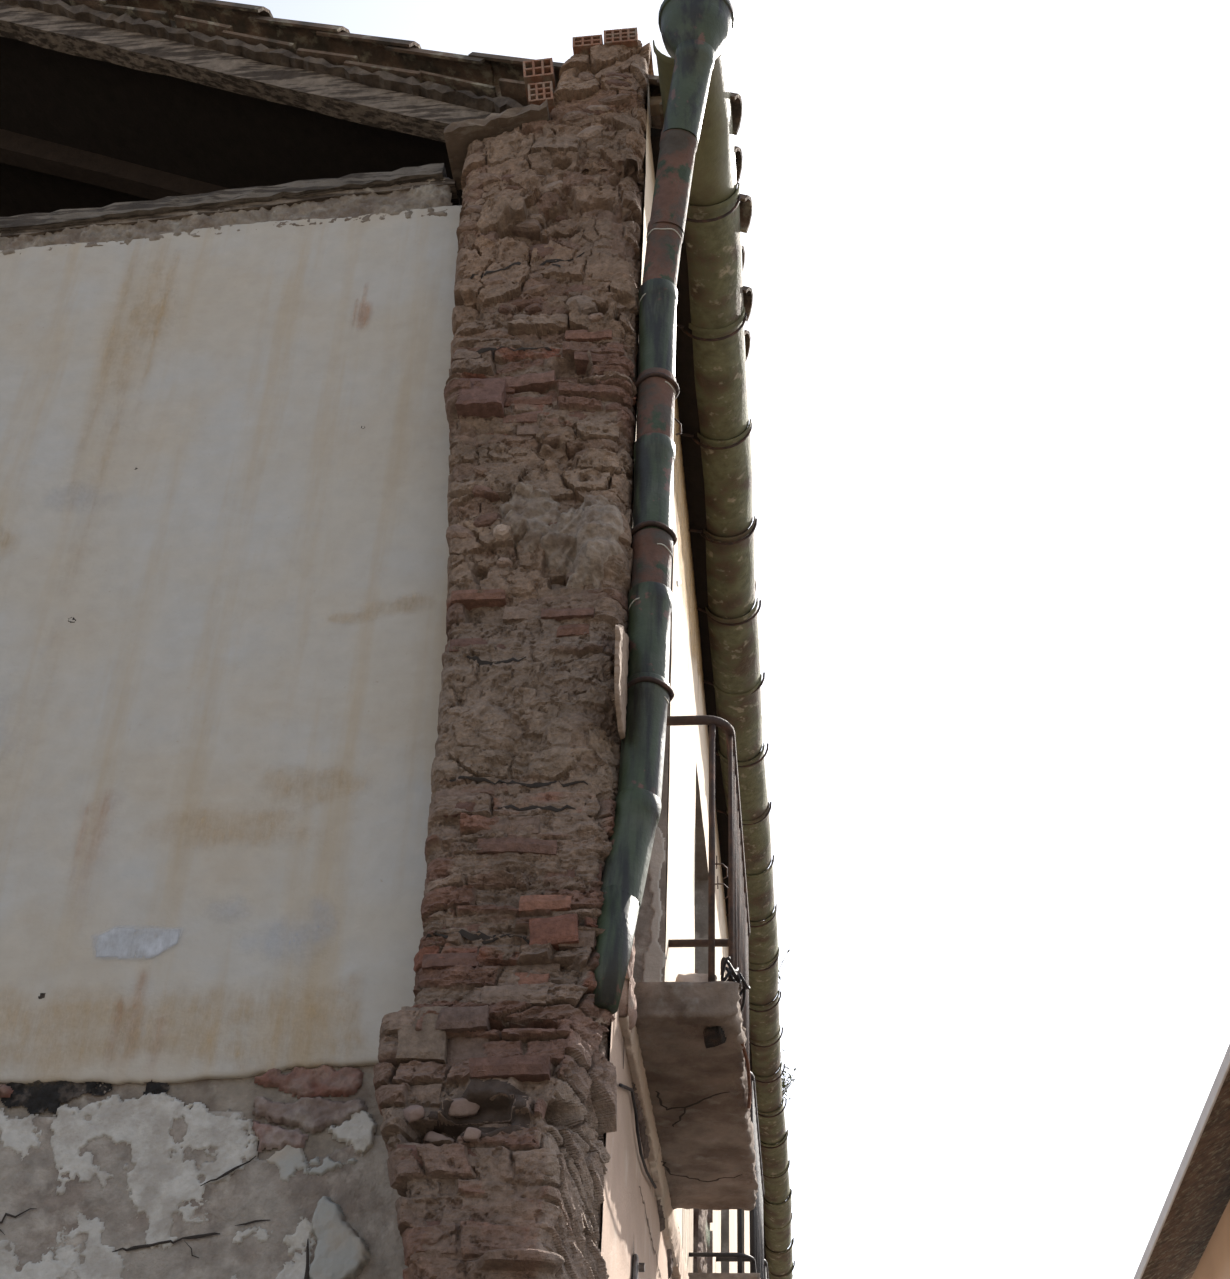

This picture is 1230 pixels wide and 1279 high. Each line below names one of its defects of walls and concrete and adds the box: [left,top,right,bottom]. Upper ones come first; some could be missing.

peeling [96,928,179,958]
peeling [0,1065,377,1251]
crack [0,1208,37,1235]
peeling [0,1212,129,1279]
peeling [232,1216,316,1279]
crack [639,1186,661,1276]
flaking render [693,1208,713,1273]